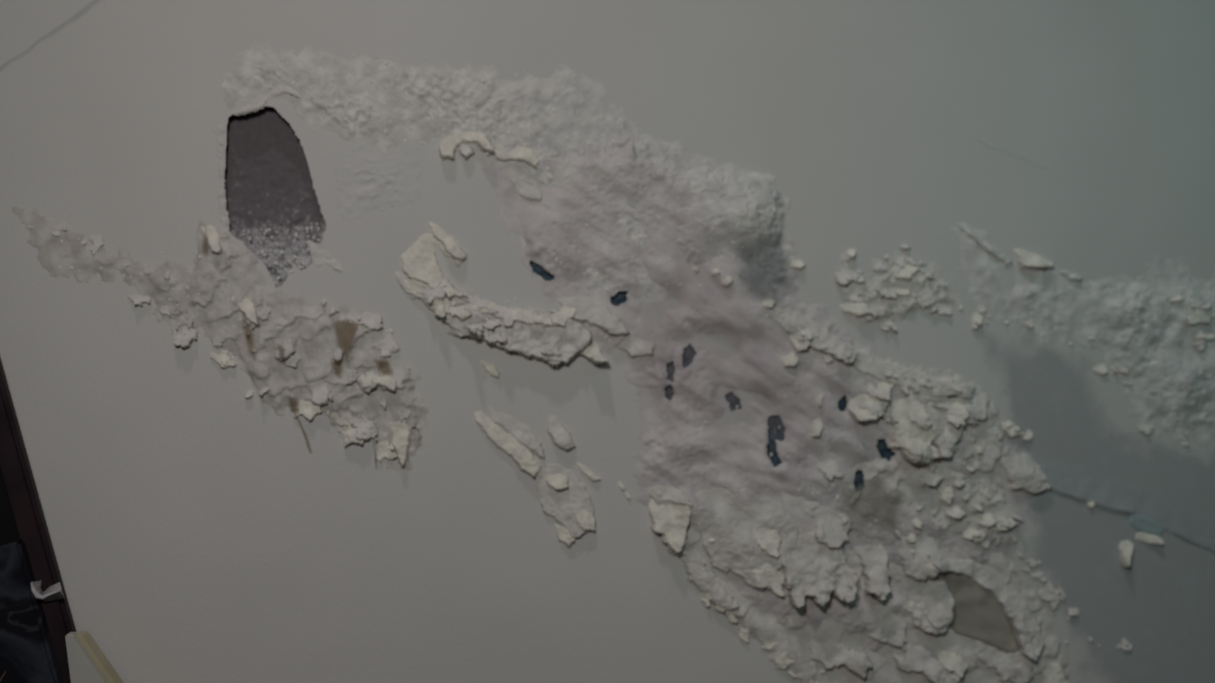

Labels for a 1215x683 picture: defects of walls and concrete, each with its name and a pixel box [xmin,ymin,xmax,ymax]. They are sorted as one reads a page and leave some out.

peeling [438,131,543,202]
peeling [12,86,429,470]
peeling [395,222,655,379]
peeling [474,406,602,548]
peeling [618,243,1080,683]
spalling [1118,514,1165,568]